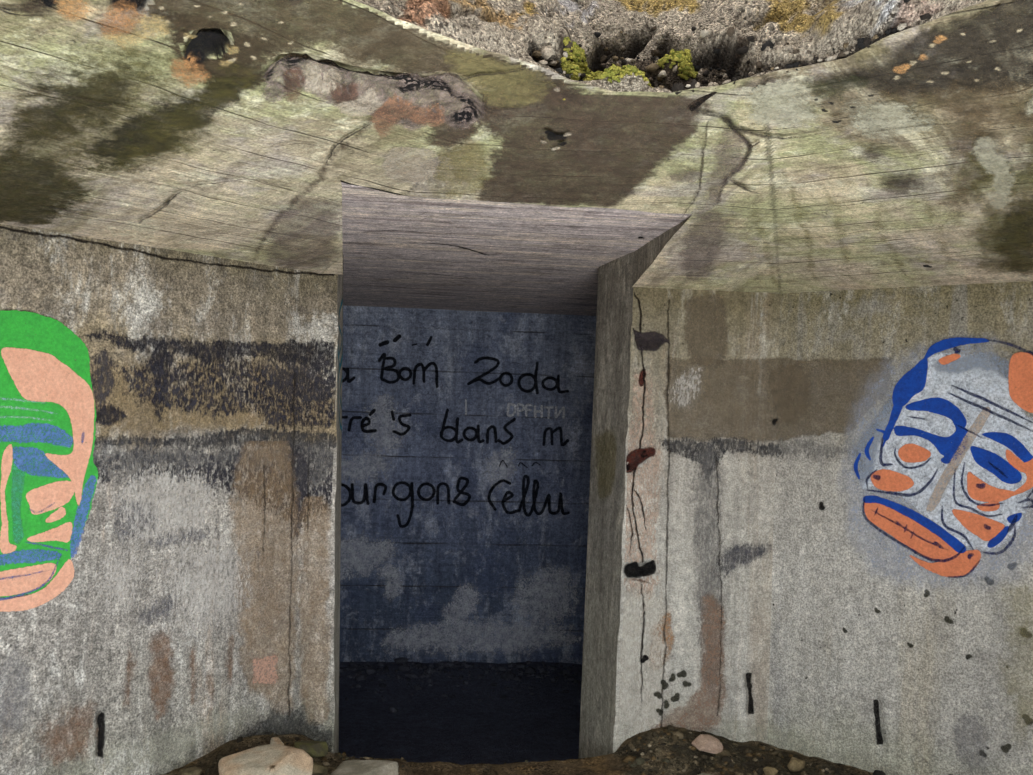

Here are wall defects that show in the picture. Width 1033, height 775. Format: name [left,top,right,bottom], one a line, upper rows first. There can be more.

spalling [22,0,89,19]
spalling [98,0,168,45]
spalling [173,28,238,88]
leakage [100,0,707,207]
crack [463,69,524,80]
leakage [739,80,822,128]
leakage [0,68,130,225]
crack [685,108,817,213]
leakage [844,87,1033,273]